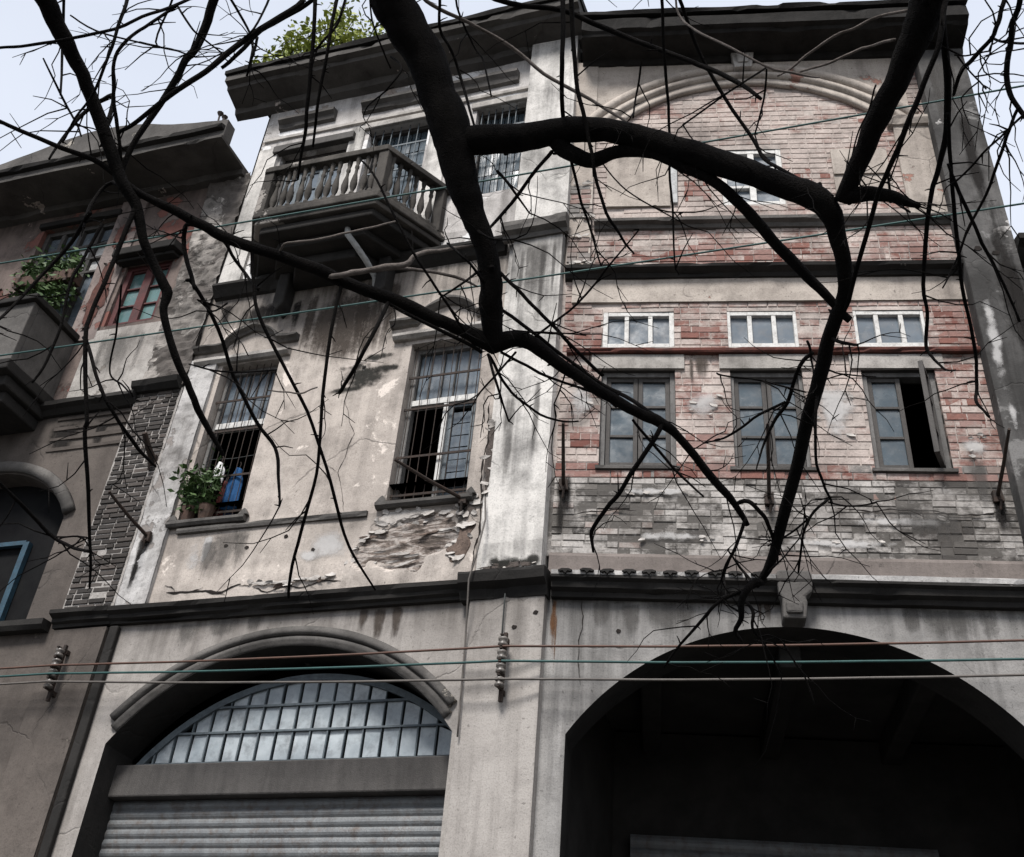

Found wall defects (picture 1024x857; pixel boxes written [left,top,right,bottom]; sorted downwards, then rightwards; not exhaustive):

flaking render [344,419,496,572]
damp [976,464,1006,524]
damp [359,607,402,636]